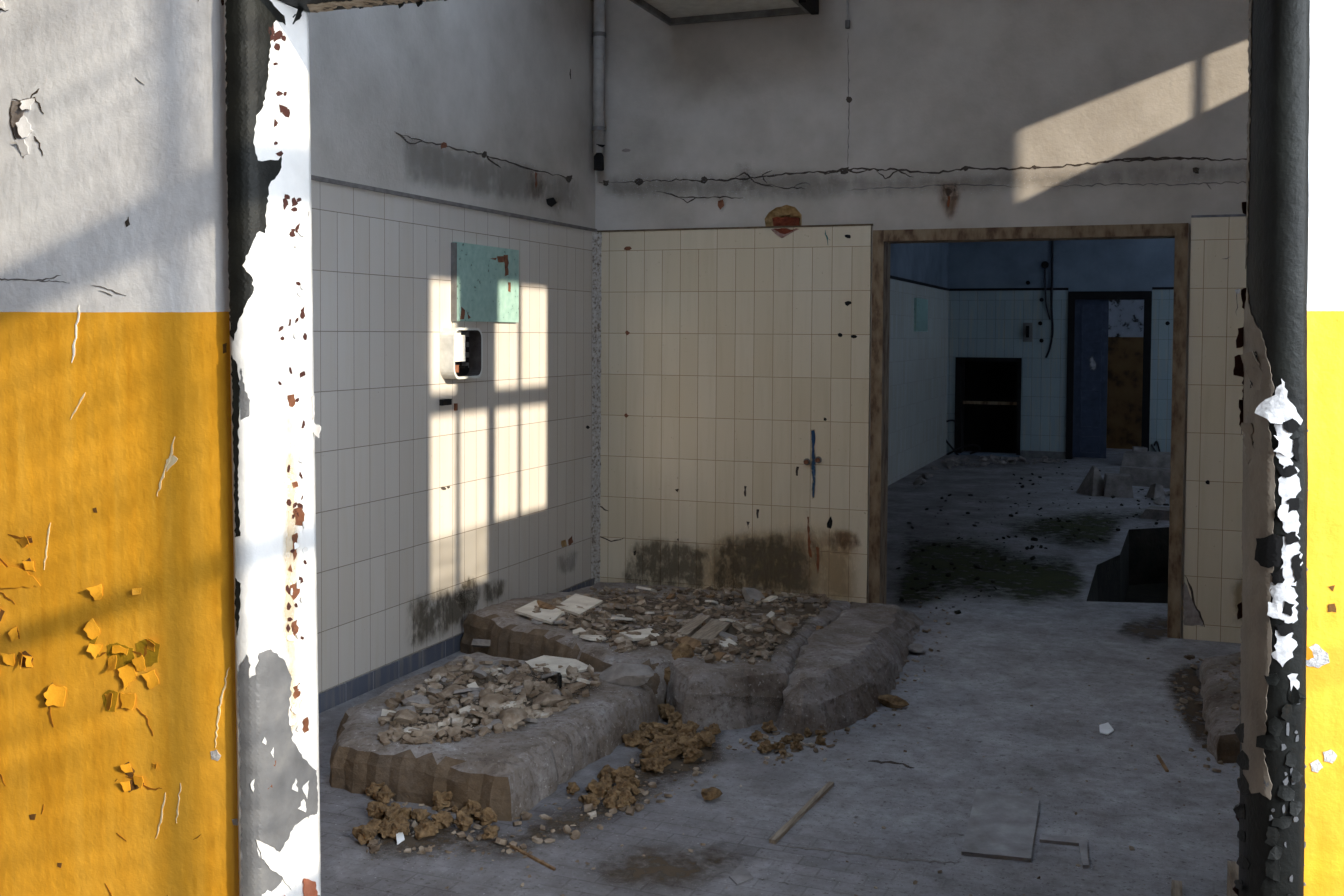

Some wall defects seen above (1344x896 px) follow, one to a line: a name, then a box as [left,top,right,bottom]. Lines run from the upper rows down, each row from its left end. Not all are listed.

peeling [9,88,44,158]
crack [394,131,566,178]
crack [599,36,1247,203]
corrosion [942,185,958,214]
peeling [221,0,447,537]
peeling [0,534,41,669]
peeling [286,465,312,640]
mould [626,536,808,592]
peeling [1233,288,1337,896]
peeling [44,682,66,727]
peeling [83,618,160,736]
peeling [232,649,320,896]